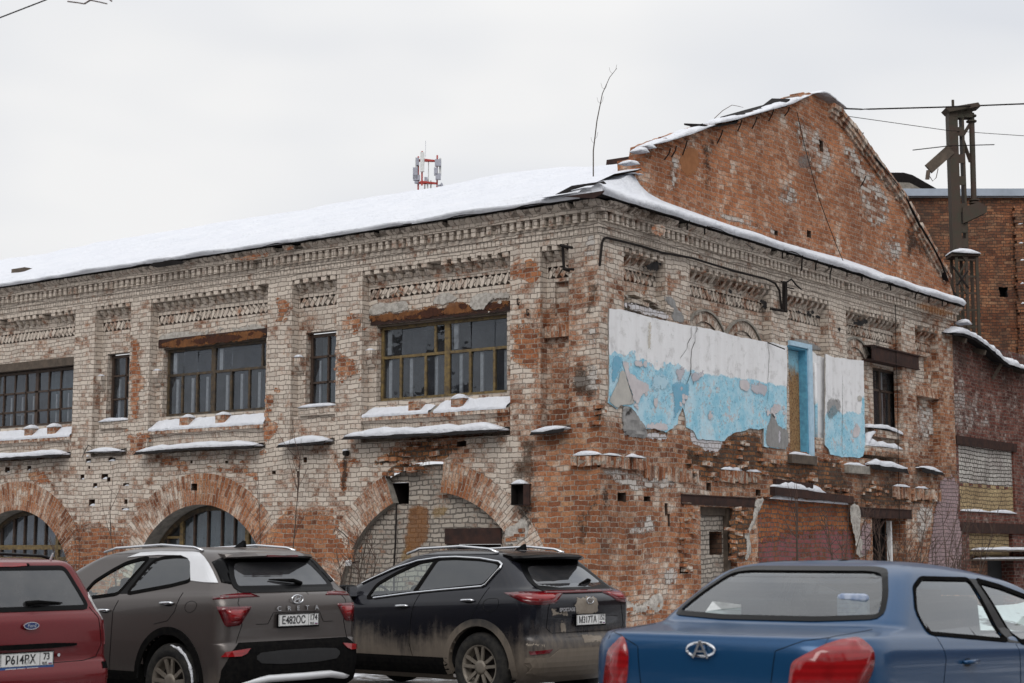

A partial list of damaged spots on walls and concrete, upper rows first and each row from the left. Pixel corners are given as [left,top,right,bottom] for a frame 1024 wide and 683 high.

rust [161,330,266,348]
peeling [159,297,293,340]
peeling [333,301,408,383]
rust [369,300,509,322]
peeling [124,335,152,453]
spalling [589,355,704,440]
spalling [686,380,941,517]
spalling [664,502,699,573]
spalling [626,593,663,614]